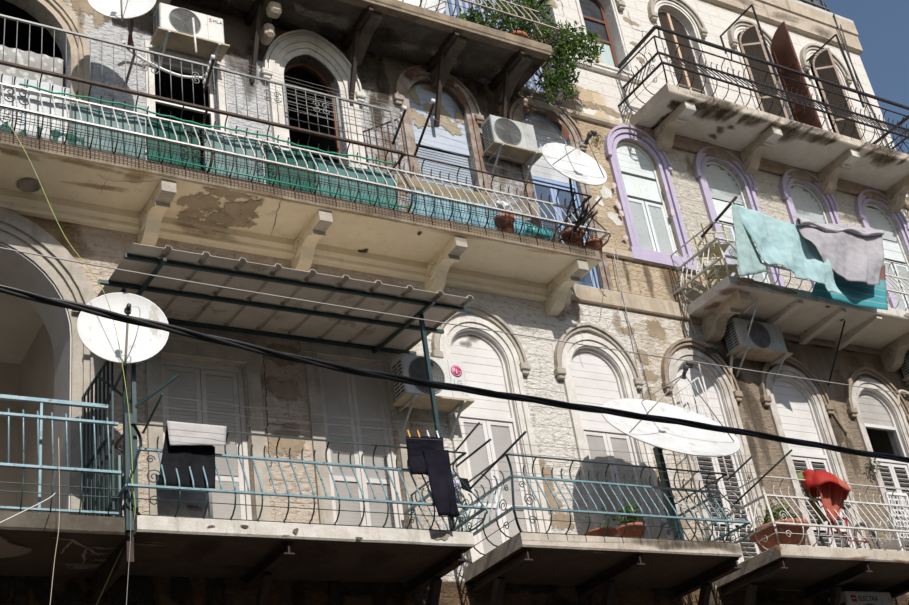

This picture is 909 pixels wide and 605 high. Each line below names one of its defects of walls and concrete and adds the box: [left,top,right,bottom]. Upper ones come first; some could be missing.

peeling [409,84,464,137]
leakage [604,94,838,192]
leakage [856,142,908,166]
peeling [174,187,264,229]
flaking render [266,422,305,459]
crack [53,537,97,563]